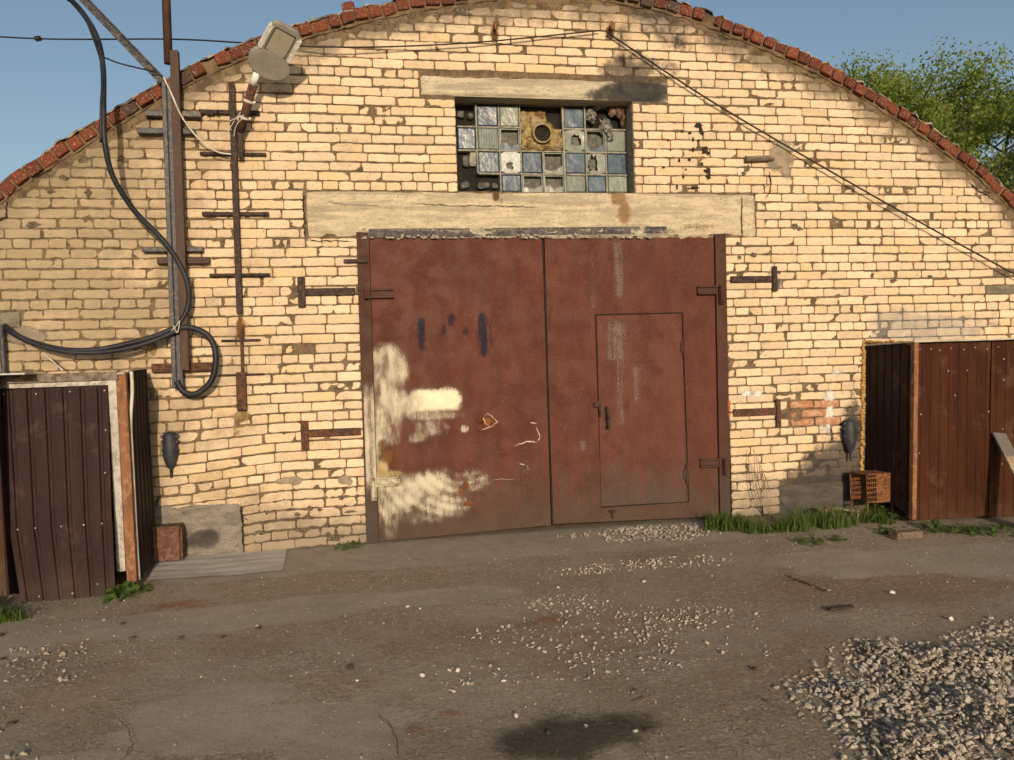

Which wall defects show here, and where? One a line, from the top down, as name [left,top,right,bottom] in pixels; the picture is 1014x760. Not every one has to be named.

corrosion [608,193,629,222]
peeling [477,413,498,430]
corrosion [377,439,402,477]